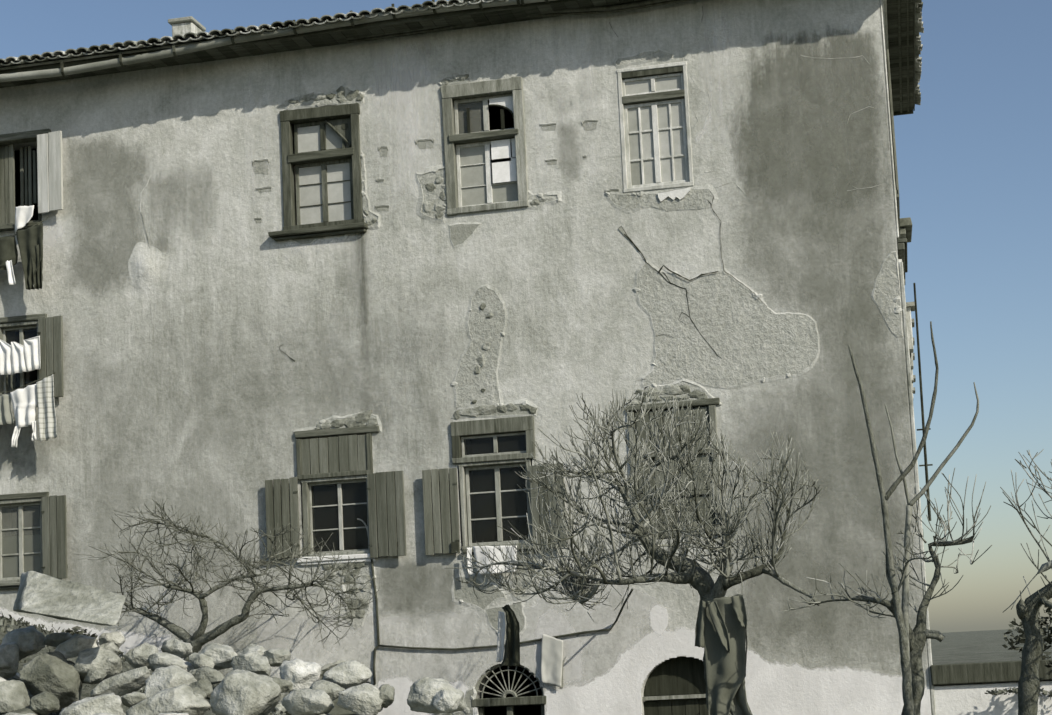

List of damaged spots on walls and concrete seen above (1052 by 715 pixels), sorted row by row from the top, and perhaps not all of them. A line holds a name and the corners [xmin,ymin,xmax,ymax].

flaking render [279,80,365,110]
flaking render [415,164,482,249]
flaking render [604,184,719,214]
flaking render [451,284,538,419]
crack [618,191,767,359]
flaking render [625,260,821,407]
leakage [736,33,903,647]
flaking render [871,251,903,338]
flaking render [293,410,383,434]
flaking render [318,562,379,631]
flaking render [433,686,477,715]